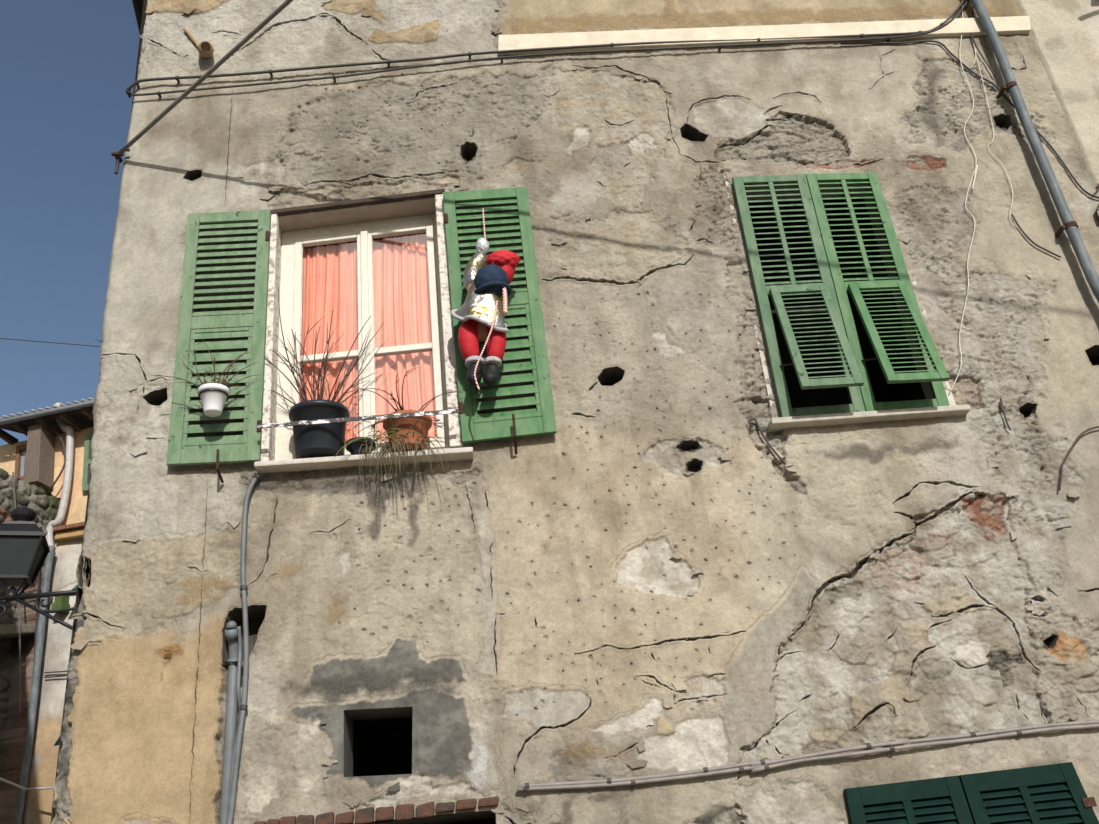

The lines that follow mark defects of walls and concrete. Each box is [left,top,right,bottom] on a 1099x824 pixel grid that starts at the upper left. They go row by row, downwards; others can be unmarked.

crack [545,64,885,189]
crack [542,216,714,287]
flaking render [136,0,881,795]
flaking render [683,55,1099,824]
crack [774,479,988,669]
flaking render [238,708,338,817]
damp [303,671,452,702]
flaking render [341,698,569,824]
efflorescence [467,743,488,789]
crack [511,629,746,777]
crack [733,692,814,780]
crack [849,575,1052,732]